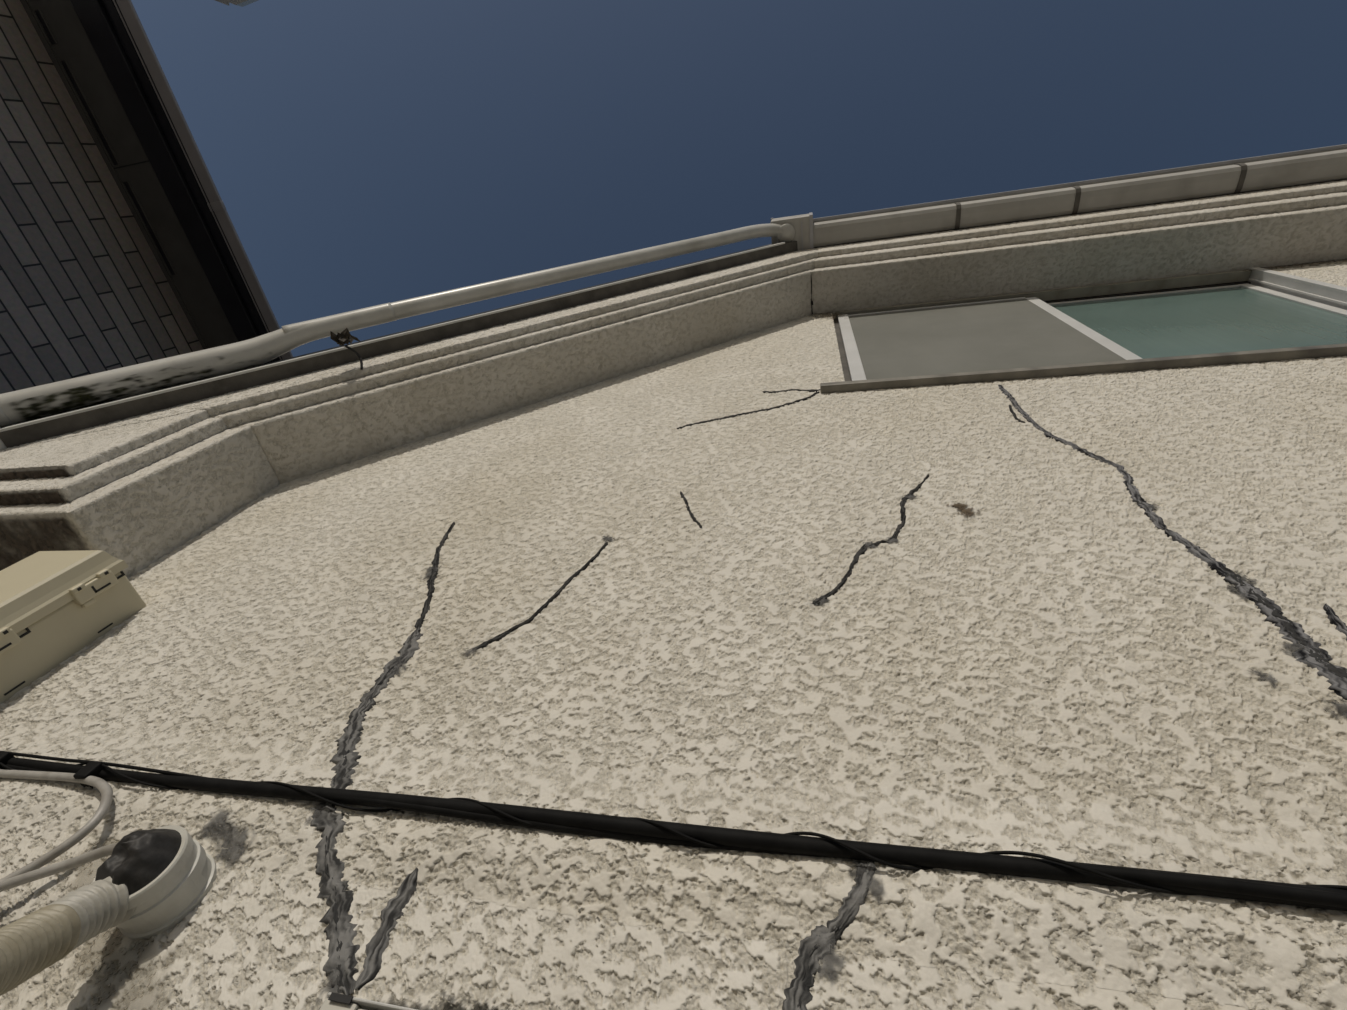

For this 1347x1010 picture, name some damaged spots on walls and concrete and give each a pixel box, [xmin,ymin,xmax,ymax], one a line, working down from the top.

crack [677,389,820,429]
crack [465,536,614,657]
crack [680,492,702,528]
crack [812,474,929,606]
crack [998,384,1347,718]
crack [305,522,455,1009]
crack [782,860,883,1010]